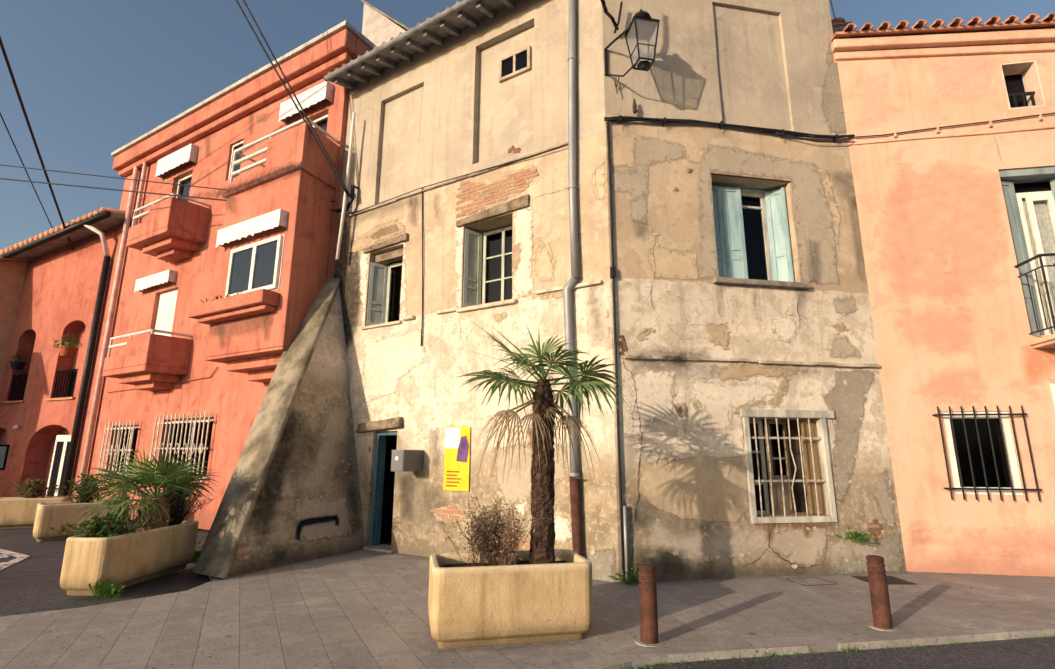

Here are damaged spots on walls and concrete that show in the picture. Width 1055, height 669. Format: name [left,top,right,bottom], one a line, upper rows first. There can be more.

flaking render [455,165,539,218]
flaking render [591,135,636,199]
spalling [707,322,731,350]
spalling [830,323,849,342]
peeling [630,362,807,463]
water stain [252,413,297,525]
crack [621,346,642,559]
flaking render [430,505,465,523]
flaking render [512,498,531,551]
peeling [554,512,572,543]
crack [744,532,828,569]
spalling [866,469,895,550]